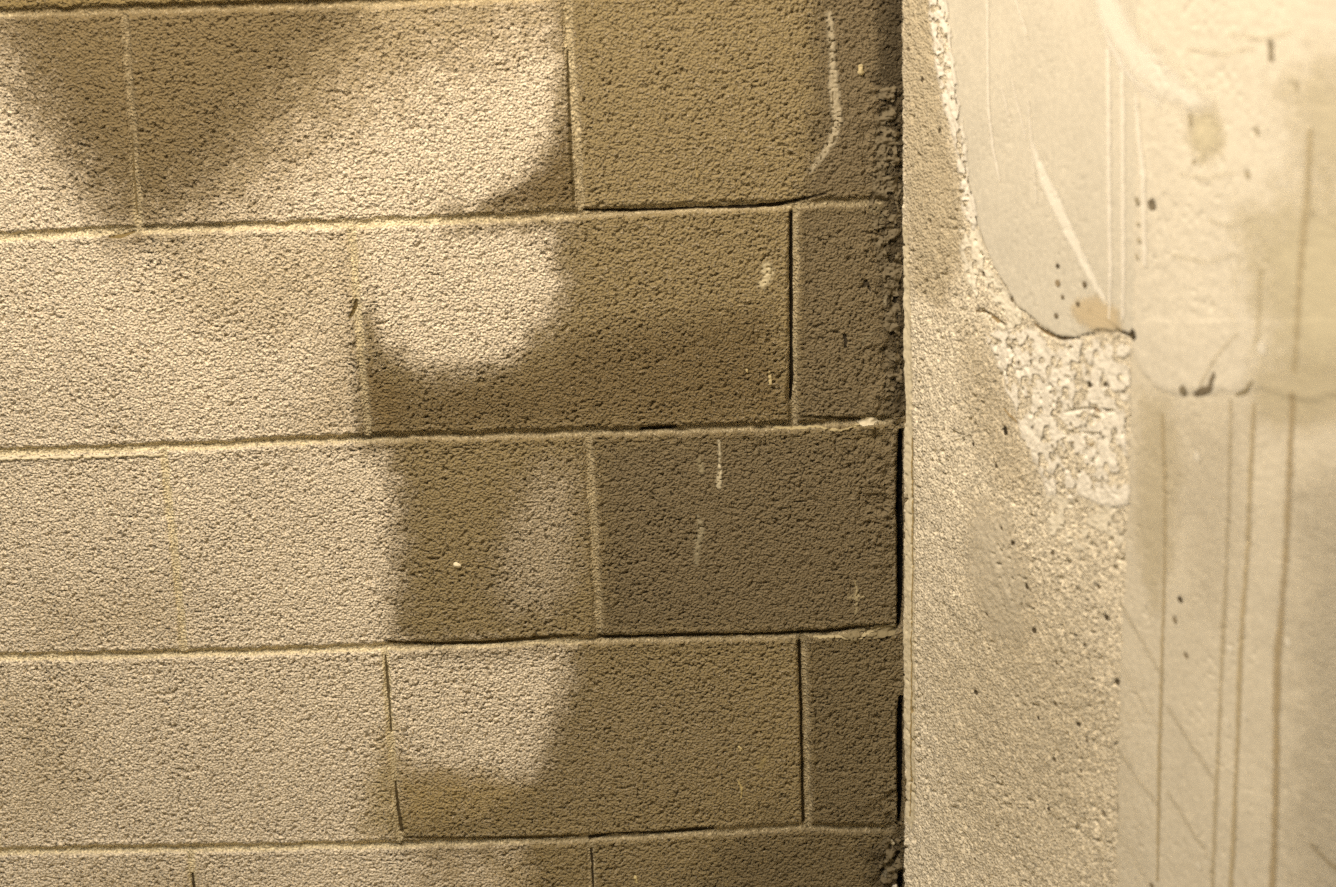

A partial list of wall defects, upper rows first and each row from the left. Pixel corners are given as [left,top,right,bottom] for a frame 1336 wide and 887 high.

crack [566,51,860,420]
peeling [920,0,1136,555]
crack [395,781,714,887]